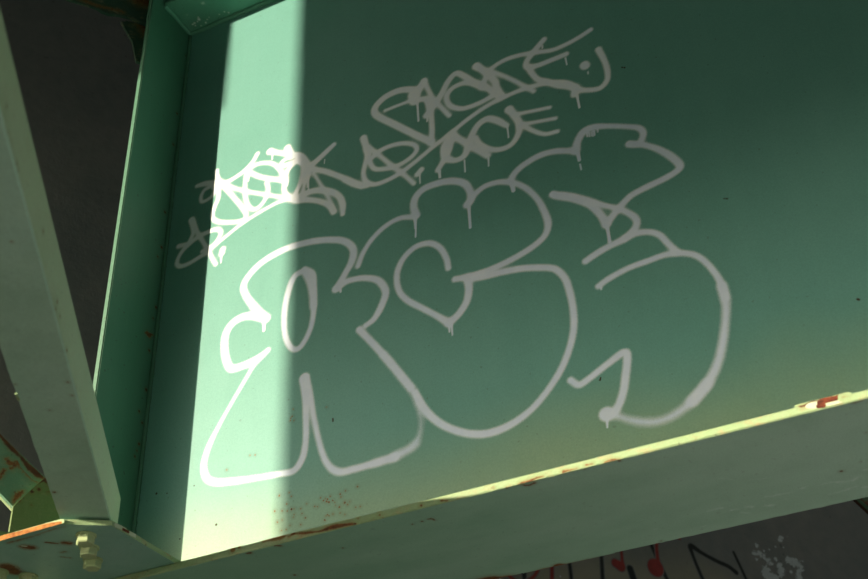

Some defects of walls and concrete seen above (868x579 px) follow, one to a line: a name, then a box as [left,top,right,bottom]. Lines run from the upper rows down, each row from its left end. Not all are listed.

peeling [805,392,853,409]
corrosion [0,434,51,509]
corrosion [0,519,76,560]
corrosion [227,483,363,556]
corrosion [0,561,27,576]